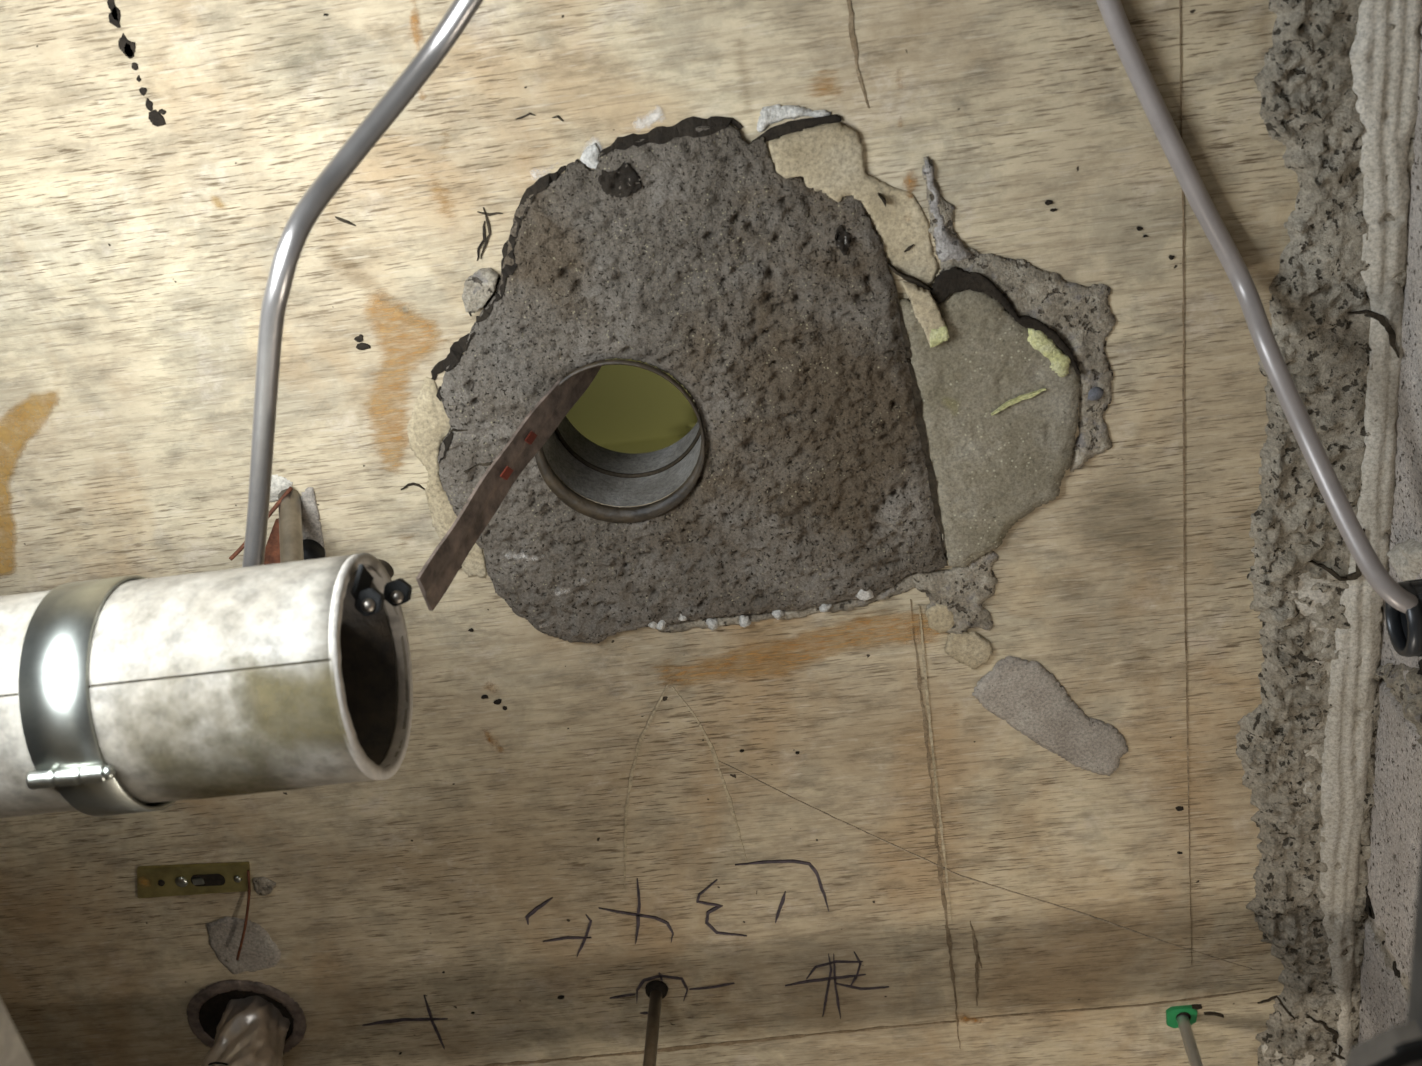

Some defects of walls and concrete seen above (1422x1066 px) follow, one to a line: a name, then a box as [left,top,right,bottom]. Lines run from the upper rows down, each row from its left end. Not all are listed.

peeling [462,267,499,313]
spalling [769,122,1116,472]
corrosion [0,394,55,574]
peeling [407,377,457,540]
peeling [462,543,487,578]
spalling [648,551,999,669]